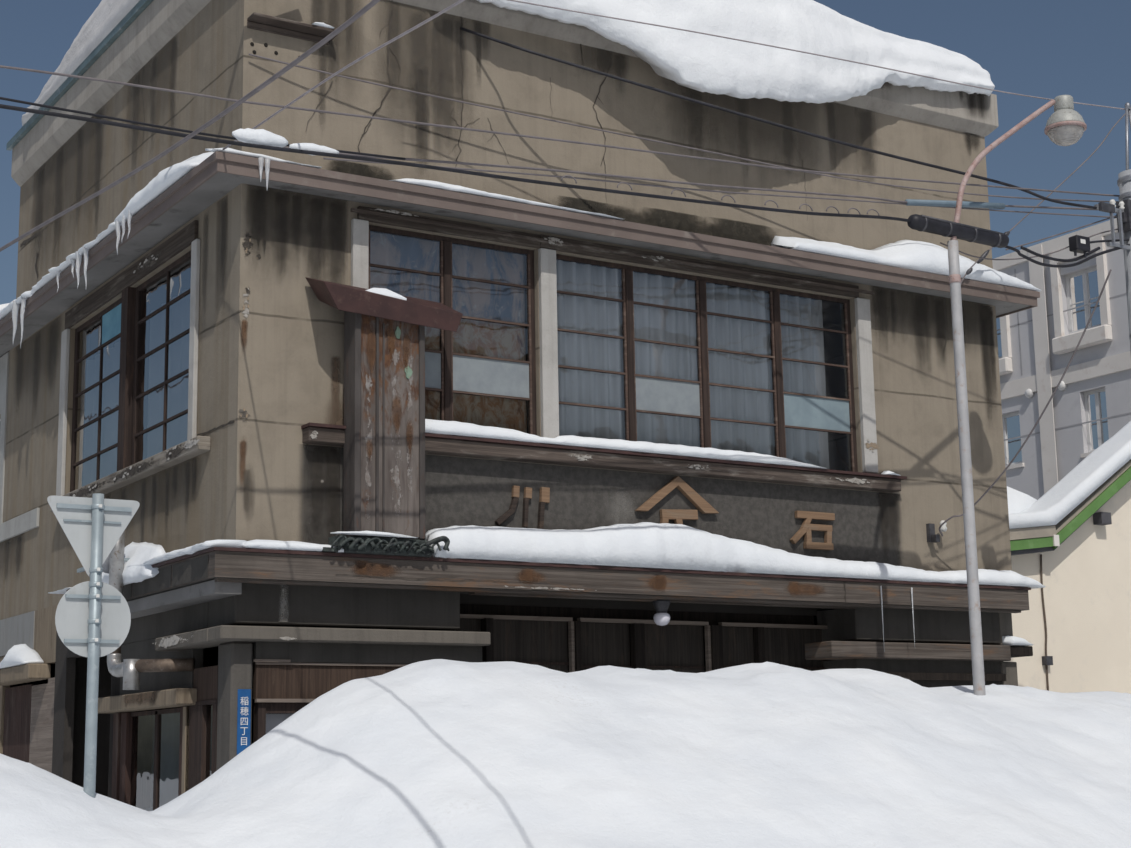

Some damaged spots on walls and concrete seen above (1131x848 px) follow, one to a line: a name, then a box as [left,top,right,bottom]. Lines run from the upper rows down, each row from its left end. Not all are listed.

water stain [250,185,346,276]
water stain [337,160,370,177]
crack [358,0,401,152]
crack [449,16,509,165]
water stain [565,197,614,216]
crack [580,44,613,203]
water stain [650,209,697,231]
water stain [966,132,978,148]
water stain [960,91,985,110]
water stain [873,286,994,387]